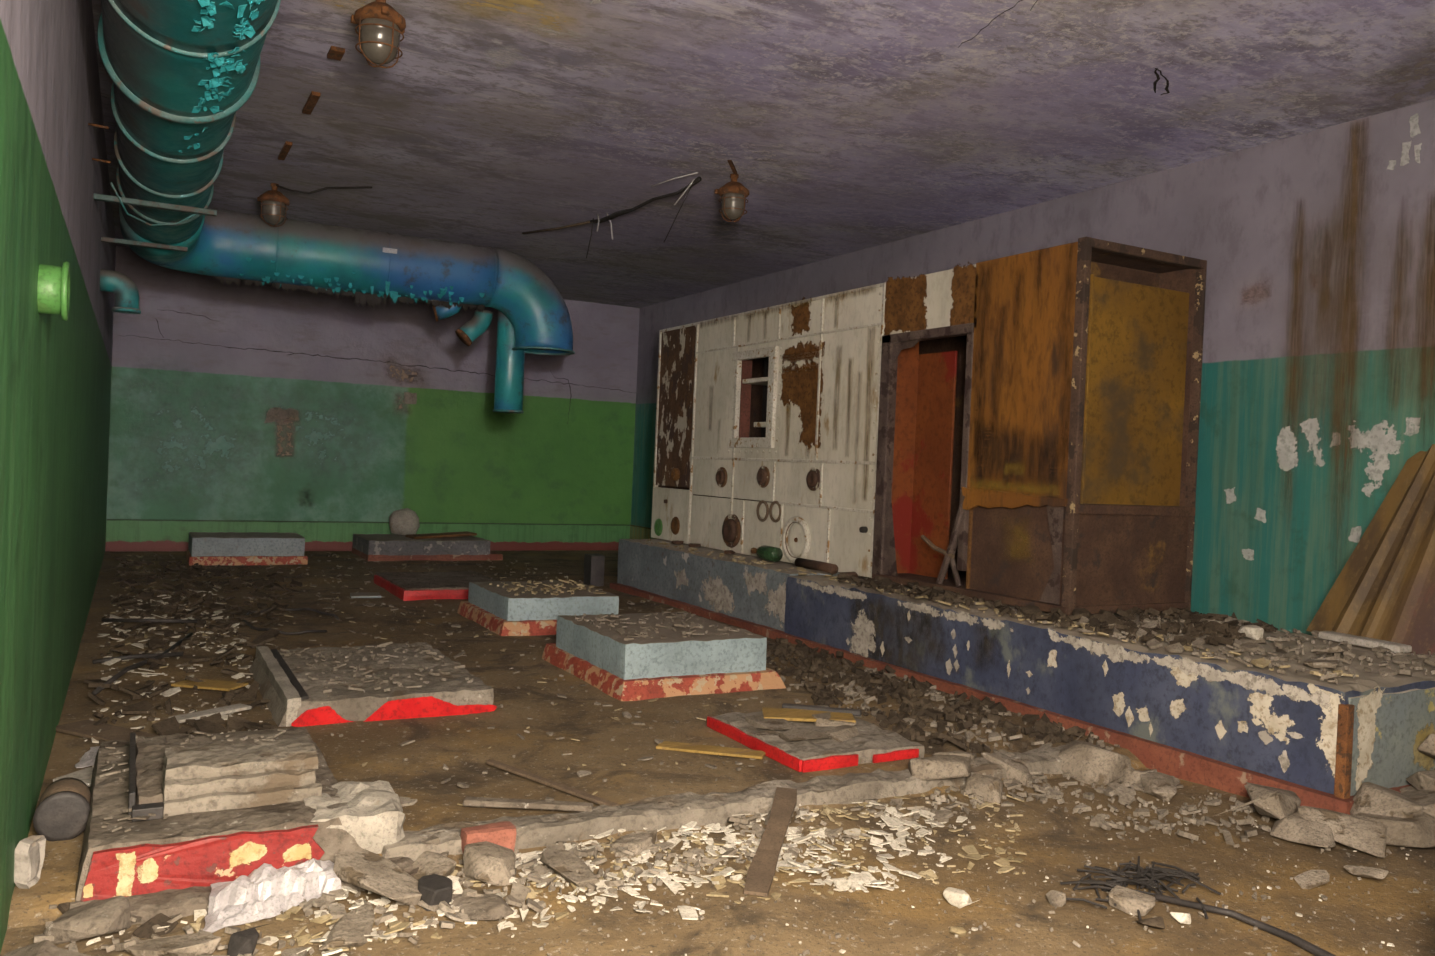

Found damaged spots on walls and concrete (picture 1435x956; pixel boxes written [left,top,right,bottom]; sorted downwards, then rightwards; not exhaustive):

peeling [178,0,265,152]
peeling [1276,417,1421,497]
peeling [1348,526,1362,543]
peeling [674,568,885,658]
spalling [898,600,1013,675]
spalling [1007,628,1386,791]